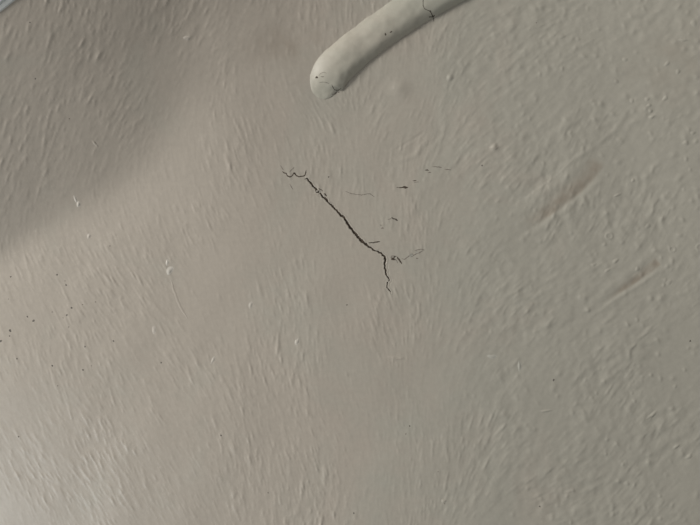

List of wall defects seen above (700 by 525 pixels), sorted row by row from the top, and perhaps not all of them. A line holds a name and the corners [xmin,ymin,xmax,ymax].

crack [281,167,398,295]